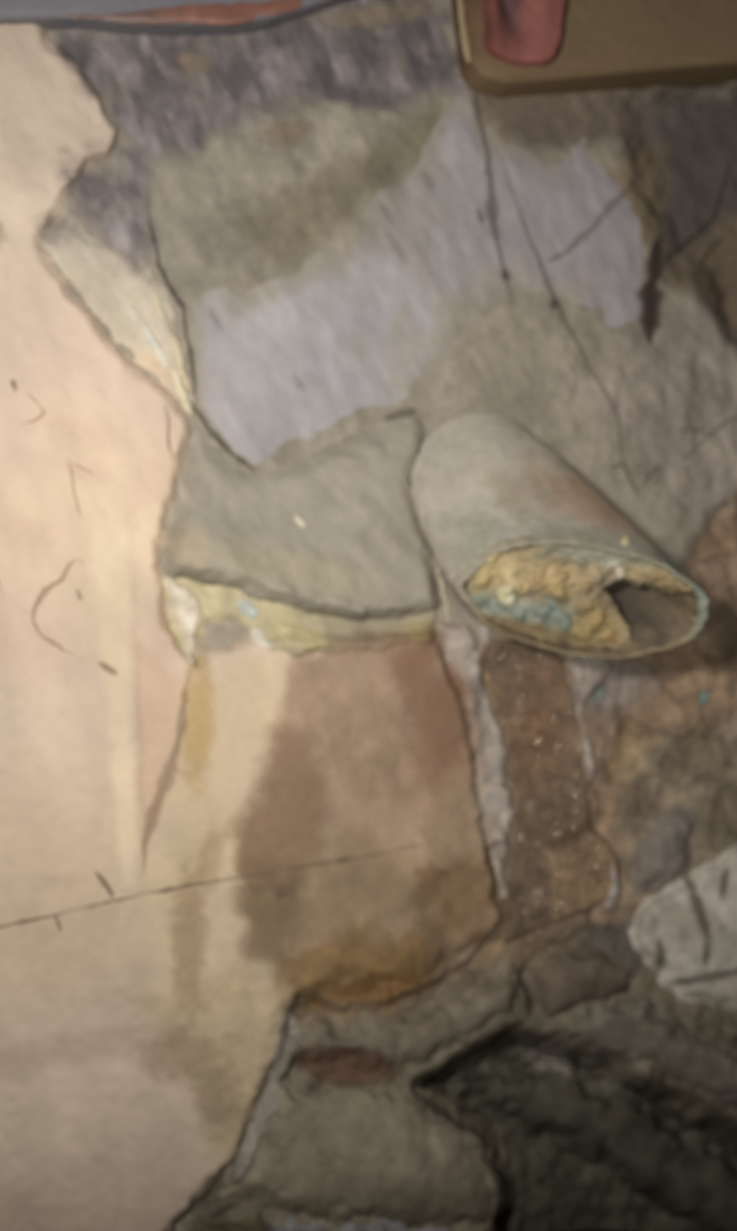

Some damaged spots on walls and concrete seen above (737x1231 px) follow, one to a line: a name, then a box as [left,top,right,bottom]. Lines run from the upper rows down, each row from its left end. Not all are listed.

flaking render [38,214,194,415]
spalling [640,236,661,344]
leakage [239,637,482,1000]